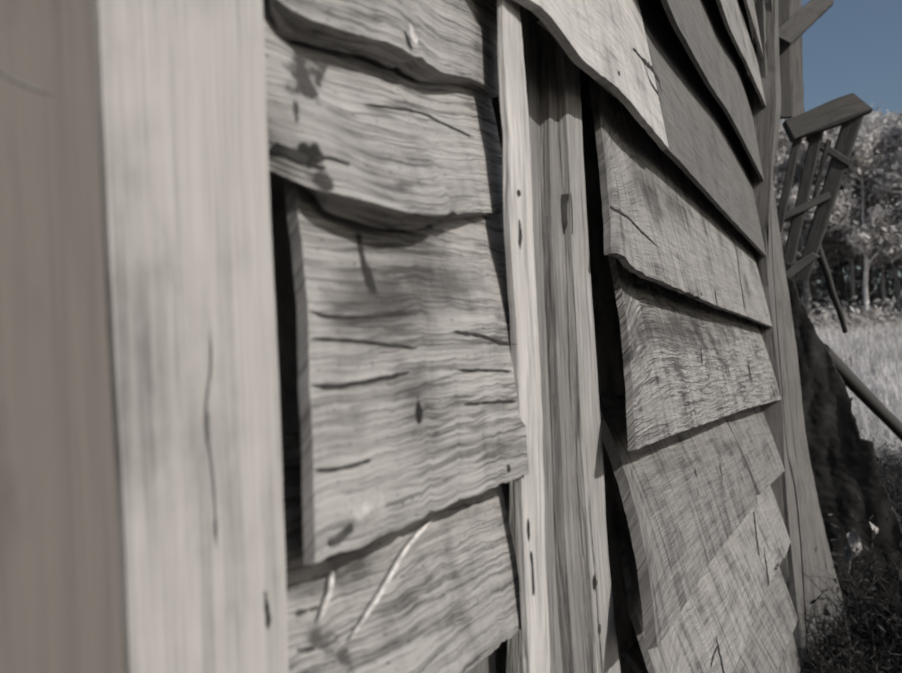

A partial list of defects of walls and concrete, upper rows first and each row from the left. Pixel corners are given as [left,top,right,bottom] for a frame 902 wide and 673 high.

crack [205,326,217,535]